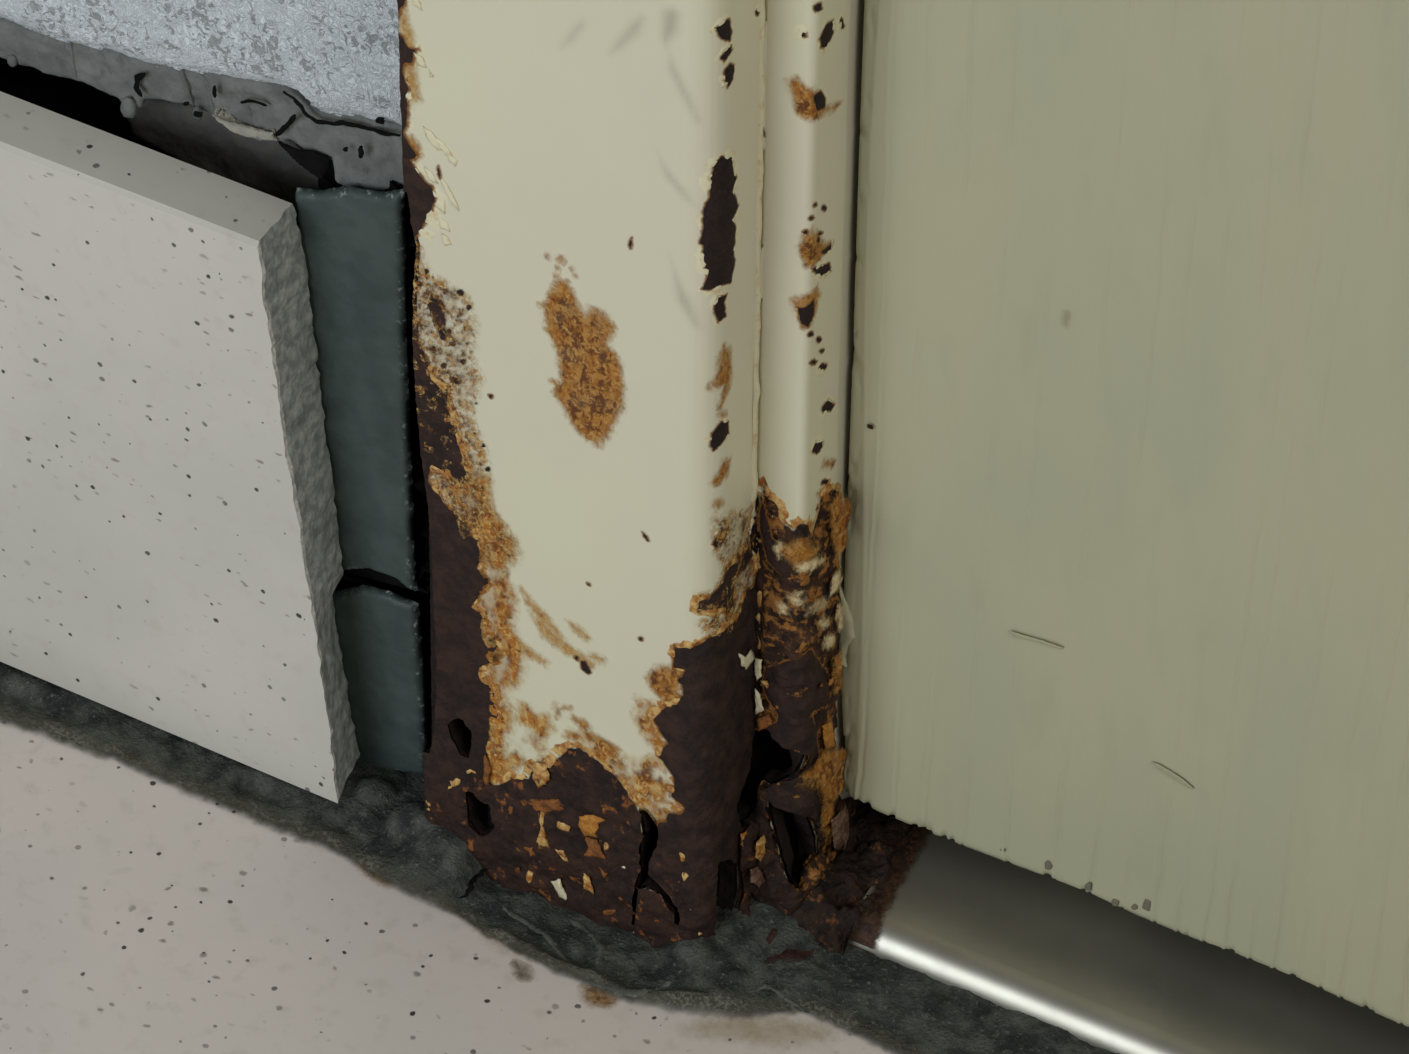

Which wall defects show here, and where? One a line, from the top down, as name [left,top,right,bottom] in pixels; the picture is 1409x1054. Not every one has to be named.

peeling [710,12,736,91]
peeling [792,2,845,55]
peeling [811,83,828,112]
peeling [693,147,740,326]
peeling [793,202,834,377]
peeling [704,414,732,452]
peeling [808,394,835,457]
rust [397,0,931,962]
crack [343,569,430,594]